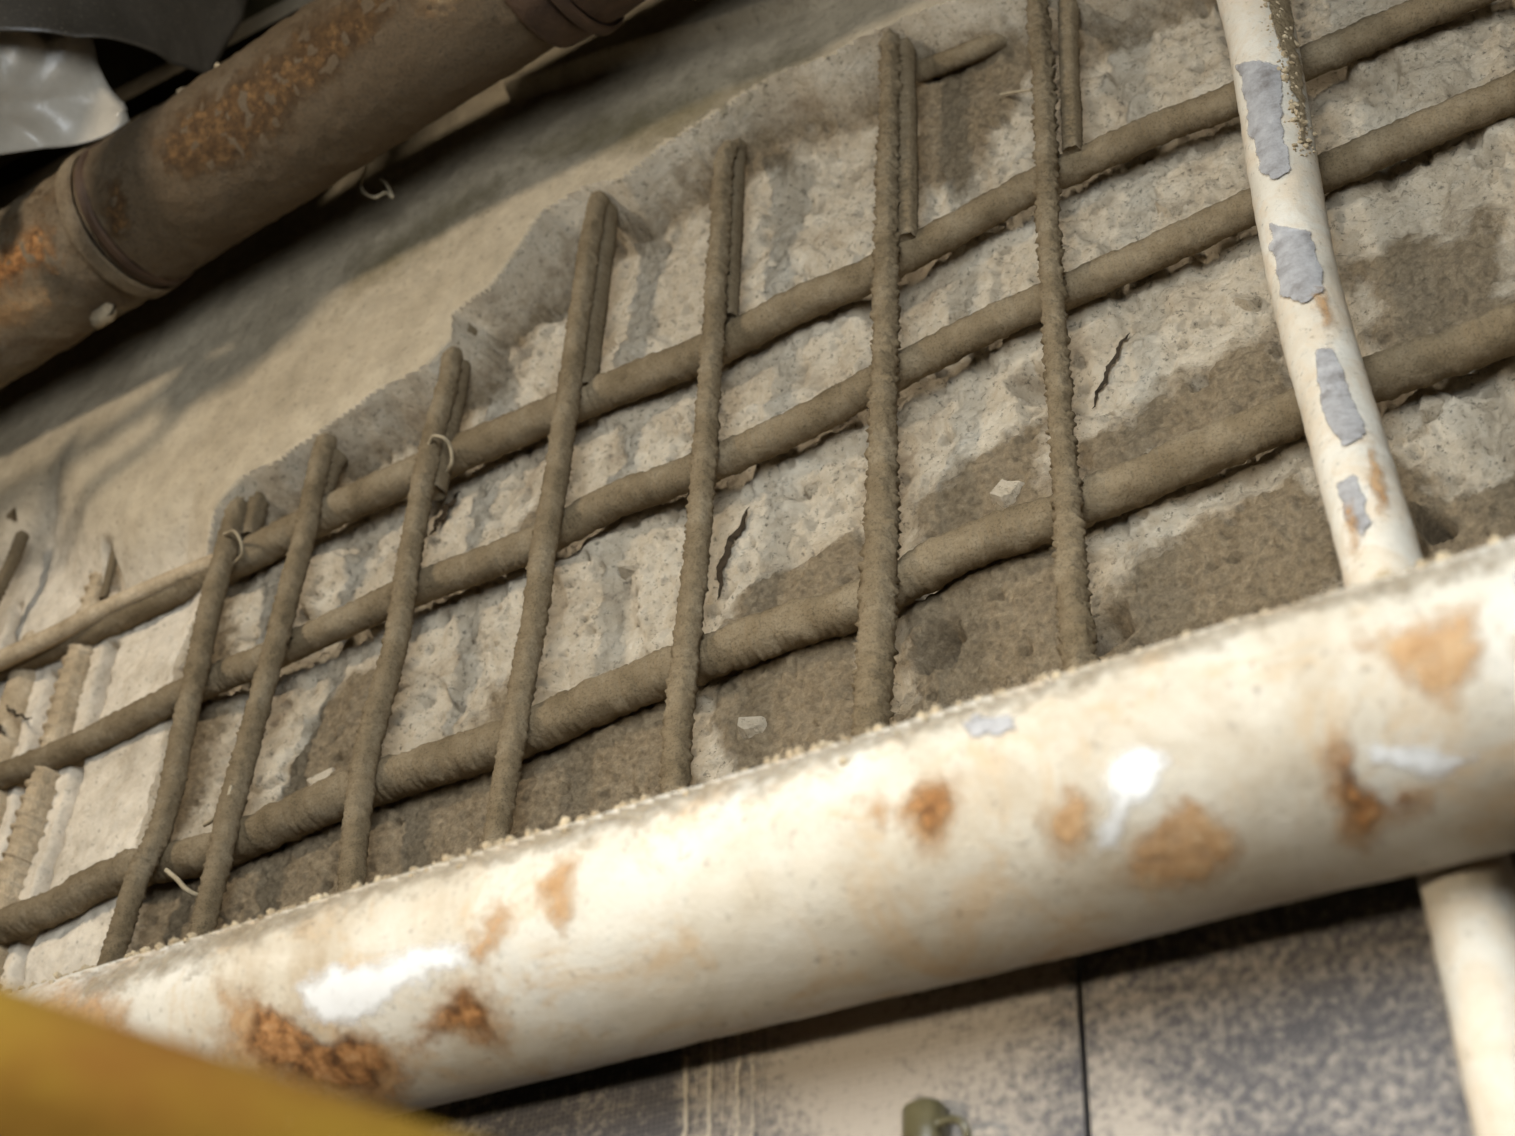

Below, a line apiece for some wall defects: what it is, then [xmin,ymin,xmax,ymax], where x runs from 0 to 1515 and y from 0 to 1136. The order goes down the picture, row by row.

corrosion [162,11,377,179]
spalling [1290,0,1515,562]
crack [1092,333,1130,409]
spalling [0,0,1345,985]
corrosion [1369,451,1387,503]
corrosion [1382,614,1480,694]
corrosion [900,786,953,842]
corrosion [1131,799,1234,888]
corrosion [1329,742,1429,845]
peeling [1372,746,1462,775]
corrosion [538,865,572,925]
peeling [299,945,466,1023]